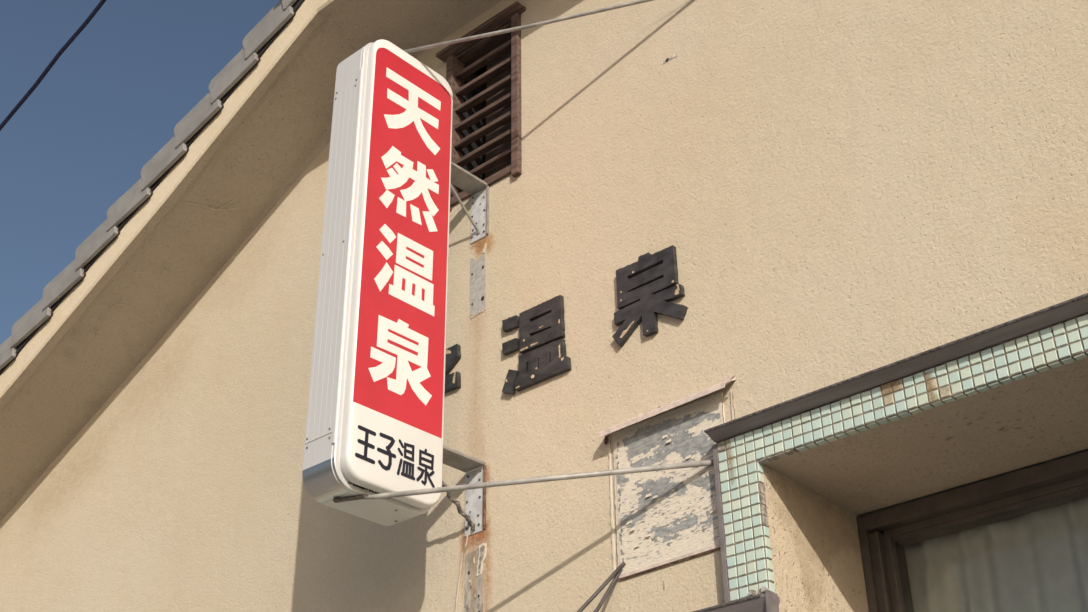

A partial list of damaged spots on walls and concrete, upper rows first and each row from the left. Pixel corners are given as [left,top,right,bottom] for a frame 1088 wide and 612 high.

corrosion [462,523,488,551]
peeling [616,411,721,570]